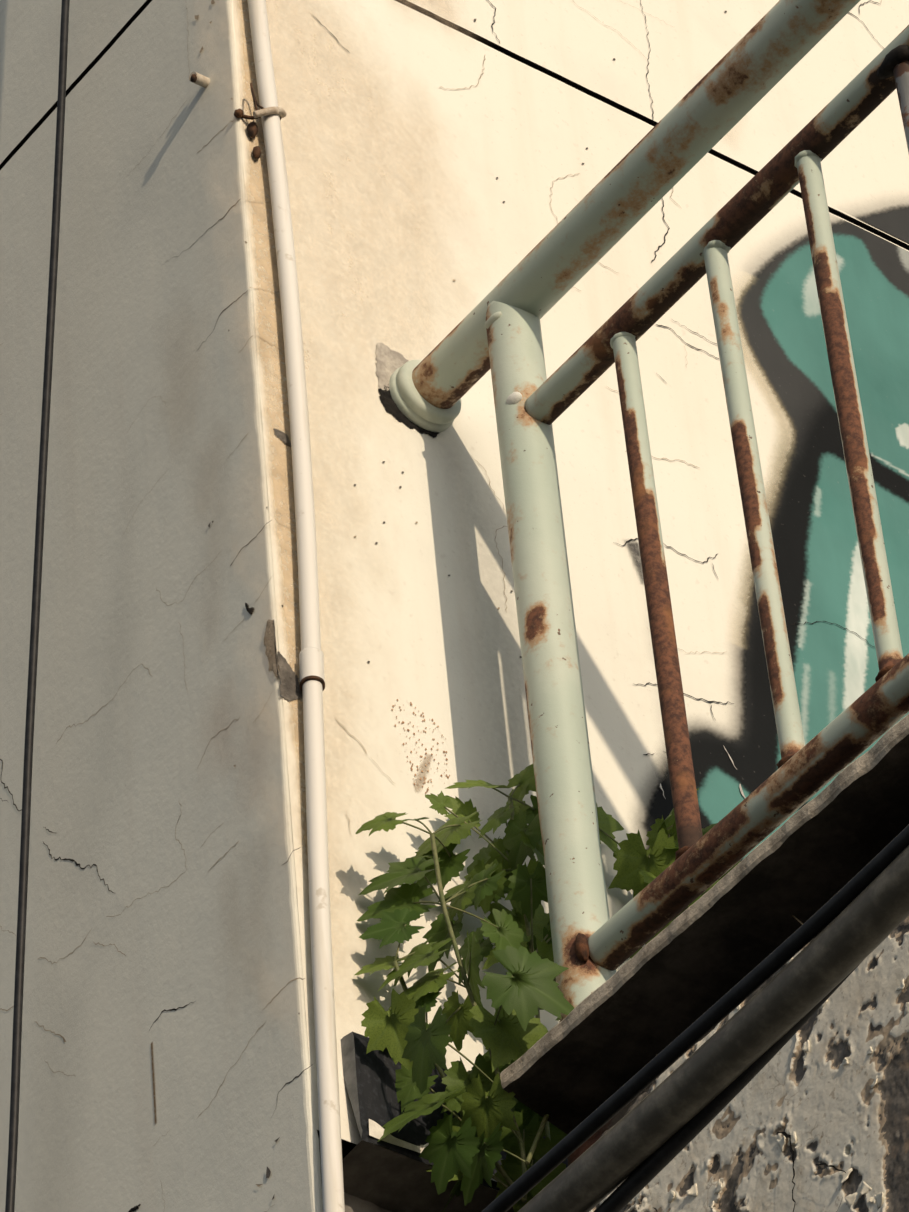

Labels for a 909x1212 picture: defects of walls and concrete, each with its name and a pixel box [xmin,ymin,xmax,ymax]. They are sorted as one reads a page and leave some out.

crack [439,0,500,90]
crack [580,0,655,125]
crack [651,192,676,263]
spalling [264,619,303,701]
crack [0,759,21,811]
crack [38,803,239,964]
crack [198,978,305,1117]
peeling [369,1119,429,1153]
spalling [708,1144,751,1212]
spalling [786,1000,828,1089]
spalling [823,1034,852,1074]
spalling [837,974,909,1212]